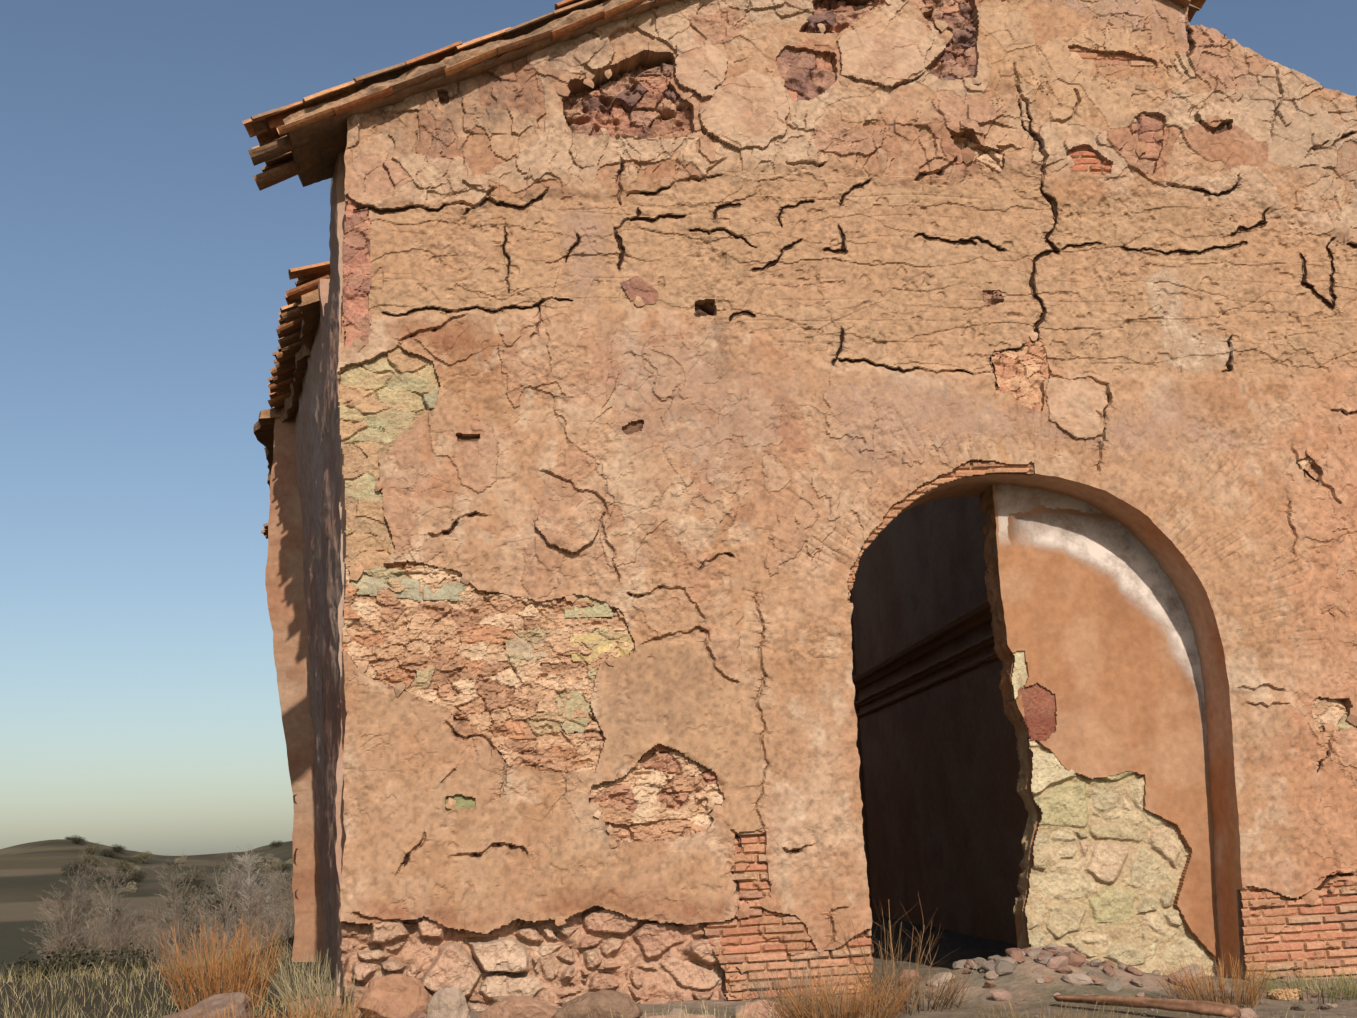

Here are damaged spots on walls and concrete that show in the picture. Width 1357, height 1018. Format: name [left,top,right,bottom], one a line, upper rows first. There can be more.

spalling [555,62,692,140]
spalling [803,0,982,85]
crack [353,193,573,337]
crack [614,164,870,270]
crack [832,88,1268,390]
crack [1300,237,1357,309]
spalling [337,196,724,848]
leakage [996,484,1205,704]
spalling [1010,650,1218,976]
spalling [340,829,874,1018]
spalling [1240,880,1357,980]
crack [1297,871,1357,900]